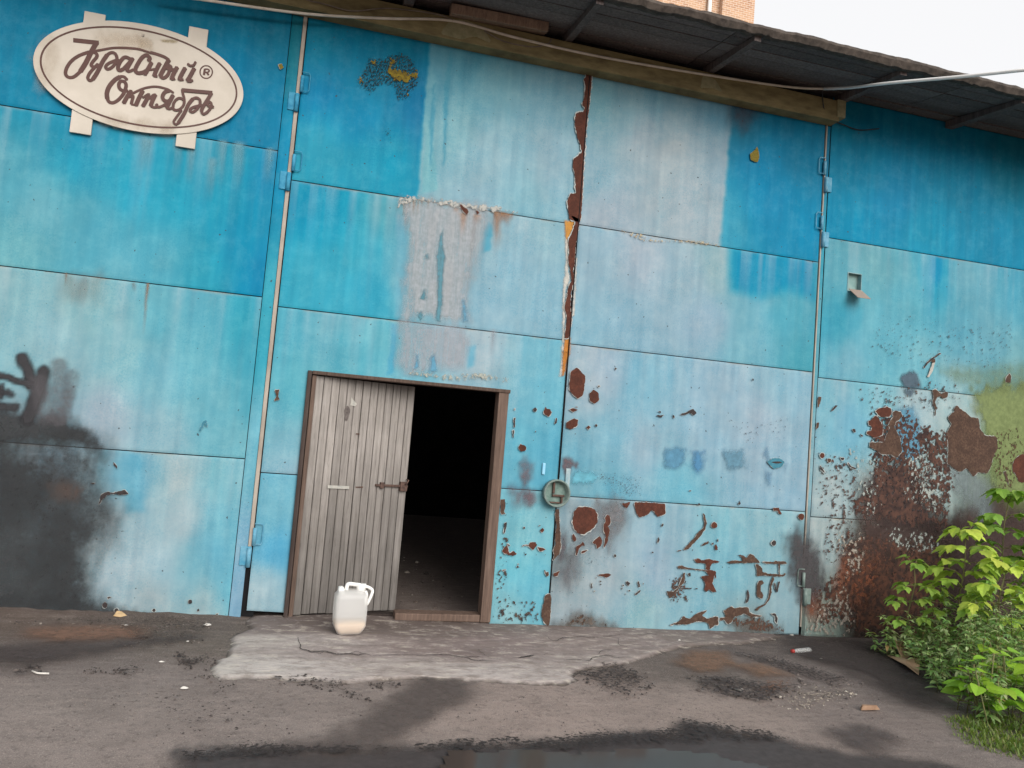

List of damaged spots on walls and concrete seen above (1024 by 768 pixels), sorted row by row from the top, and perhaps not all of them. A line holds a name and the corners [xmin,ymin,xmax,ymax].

peeling [358,52,418,100]
peeling [398,195,518,215]
peeling [564,75,593,339]
water stain [0,410,114,612]
corrosion [836,470,1024,641]
water stain [951,382,1024,515]